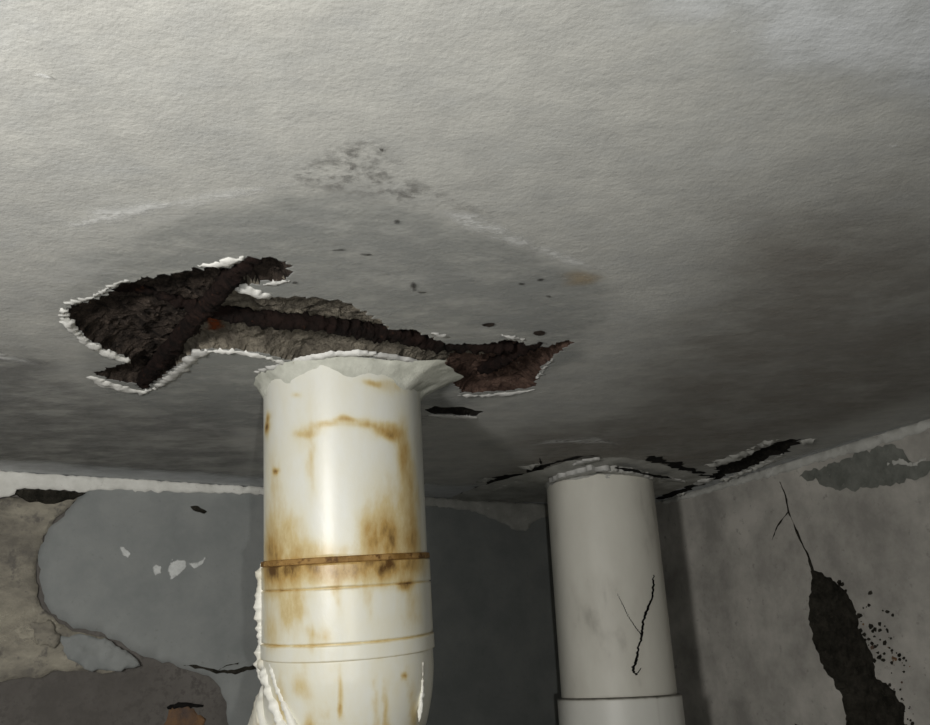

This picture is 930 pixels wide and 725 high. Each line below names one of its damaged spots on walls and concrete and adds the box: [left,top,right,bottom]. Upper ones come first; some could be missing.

leakage [0,0,930,485]
spalling [58,256,574,420]
spalling [0,471,264,682]
crack [467,455,594,498]
crack [615,438,818,503]
crack [772,483,814,571]
peeling [661,420,930,504]
spalling [808,570,914,725]